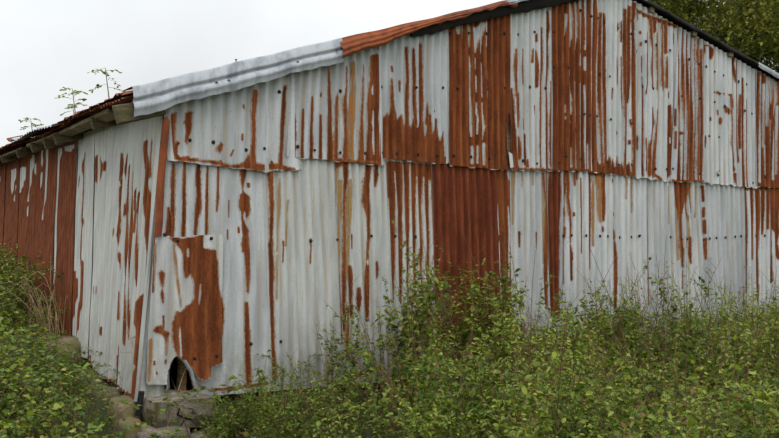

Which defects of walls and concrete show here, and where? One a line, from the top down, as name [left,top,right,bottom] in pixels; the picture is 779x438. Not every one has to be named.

corrosion [72,153,85,336]
corrosion [95,155,107,182]
corrosion [102,140,165,400]
corrosion [153,0,779,391]